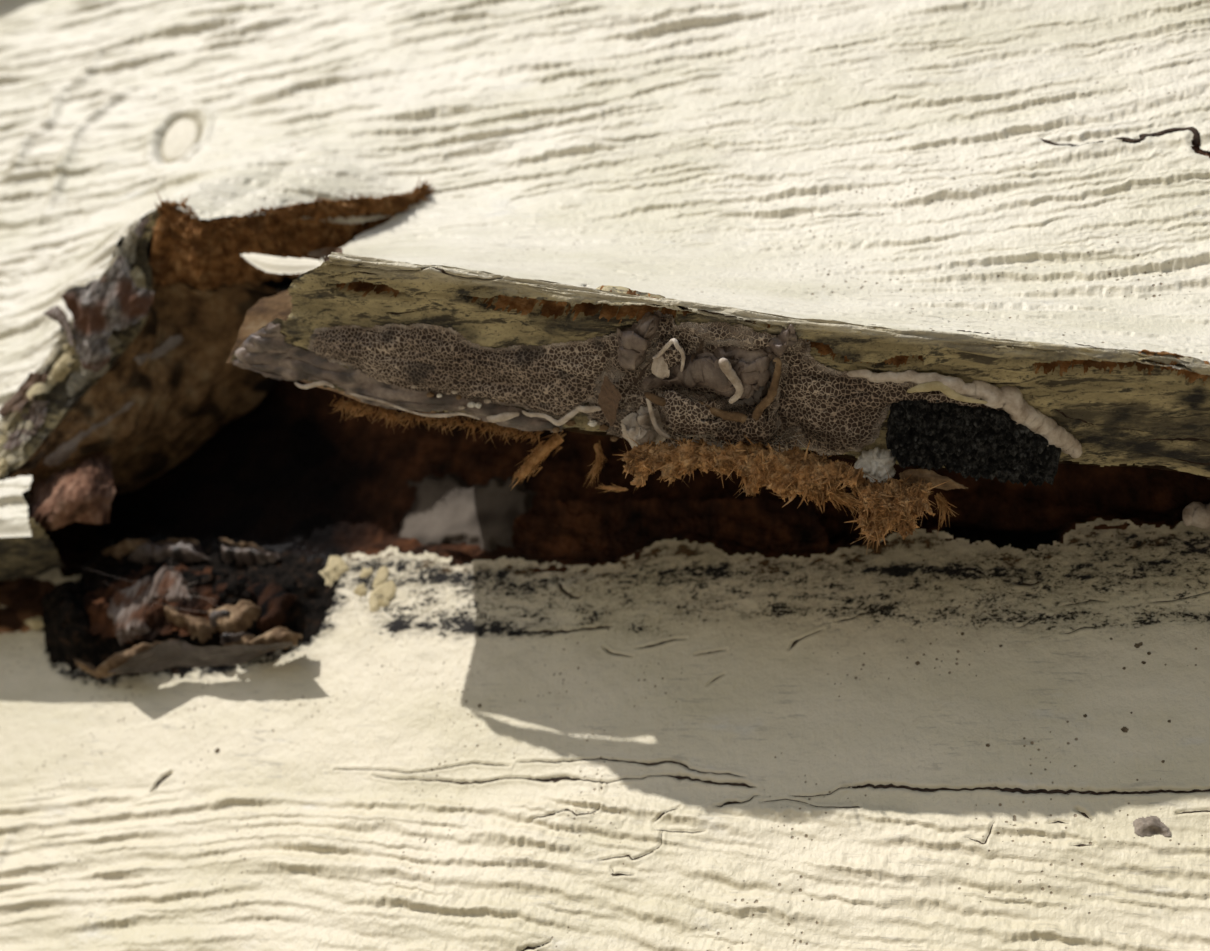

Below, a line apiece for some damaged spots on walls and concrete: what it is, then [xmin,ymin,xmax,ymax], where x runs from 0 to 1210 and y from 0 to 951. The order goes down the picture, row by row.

crack [1040,127,1210,158]
peeling [0,218,154,477]
peeling [398,473,537,552]
peeling [319,555,397,612]
water stain [47,528,1210,688]
crack [336,758,1210,876]